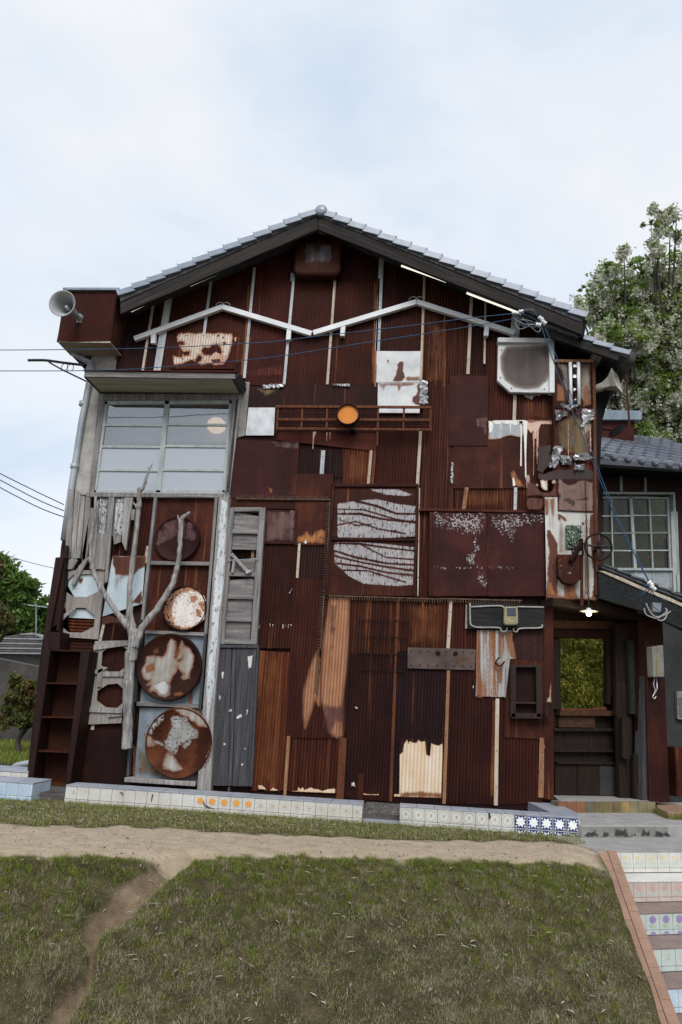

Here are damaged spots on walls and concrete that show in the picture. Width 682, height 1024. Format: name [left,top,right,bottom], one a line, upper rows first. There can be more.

peeling [173,332,237,366]
corrosion [372,284,446,404]
corrosion [510,404,592,521]
peeling [334,489,416,586]
peeling [434,511,543,588]
corrosion [547,514,598,600]
peeling [141,587,207,772]
corrosion [477,632,515,795]
peeling [351,740,443,824]